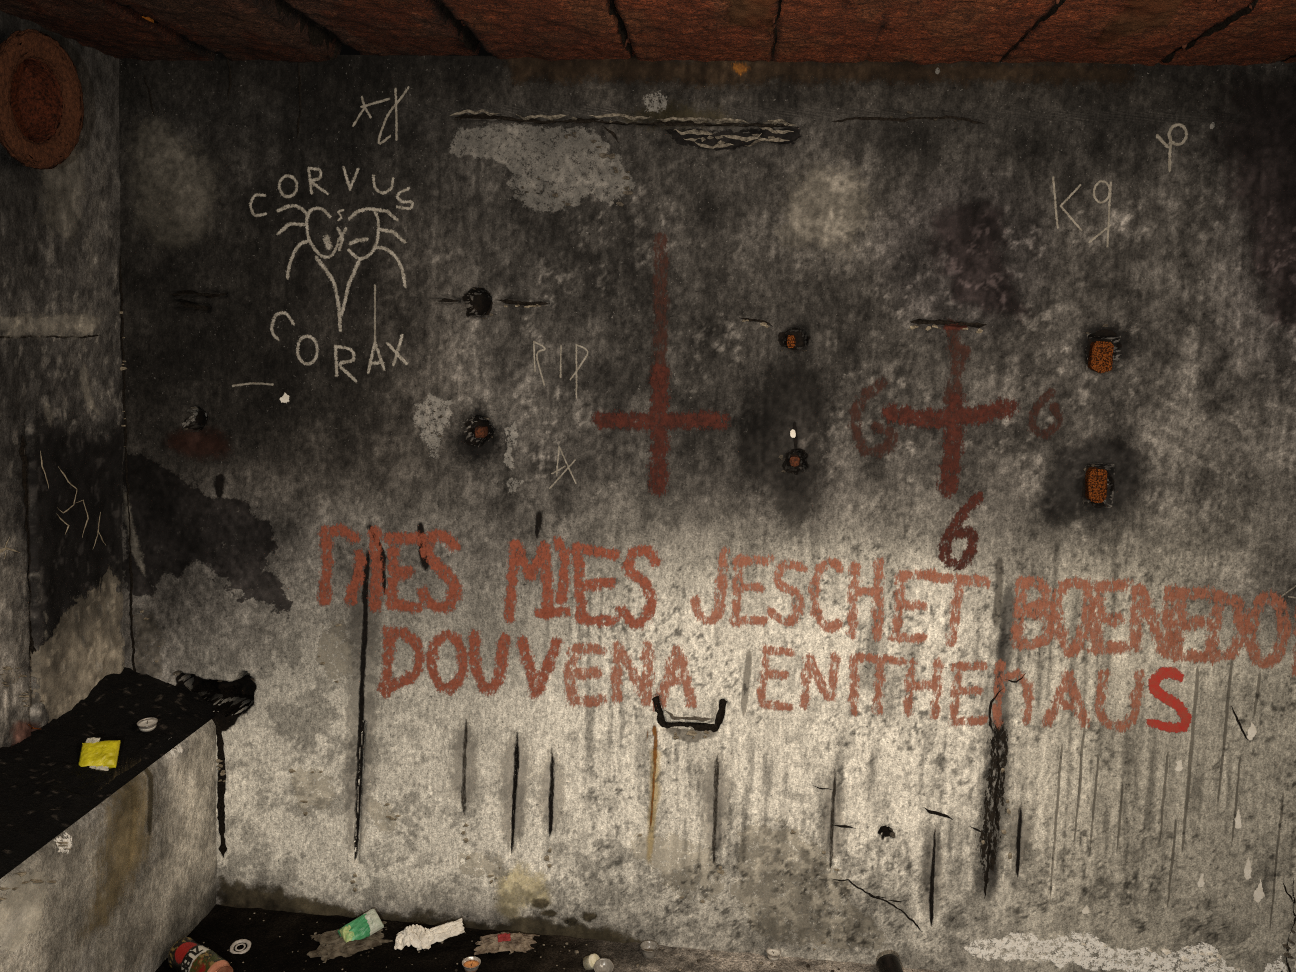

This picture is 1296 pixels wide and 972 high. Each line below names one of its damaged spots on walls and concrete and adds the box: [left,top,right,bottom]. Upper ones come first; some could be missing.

crack [450,109,795,142]
flaking render [449,122,635,213]
damp [214,474,225,498]
damp [975,558,1031,899]
crack [1281,878,1296,972]
damp [964,931,1246,972]
damp [1264,956,1287,972]